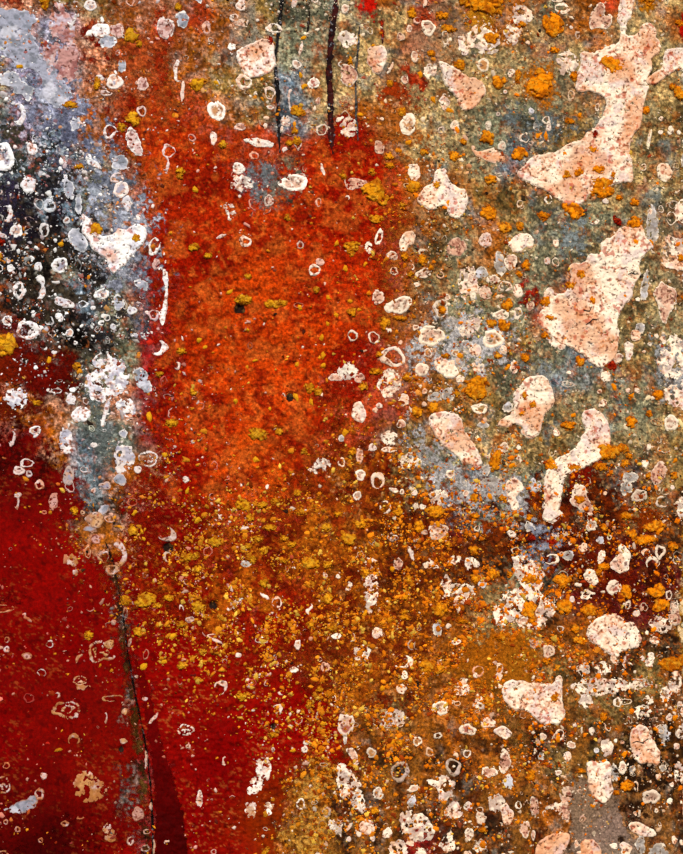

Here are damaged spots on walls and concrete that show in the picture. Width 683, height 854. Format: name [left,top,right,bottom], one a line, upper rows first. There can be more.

crack [274,0,284,153]
crack [306,0,350,154]
crack [355,19,385,140]
peeling [517,0,683,205]
peeling [386,231,416,260]
peeling [413,199,683,604]
peeling [389,476,448,509]
crack [105,542,154,854]